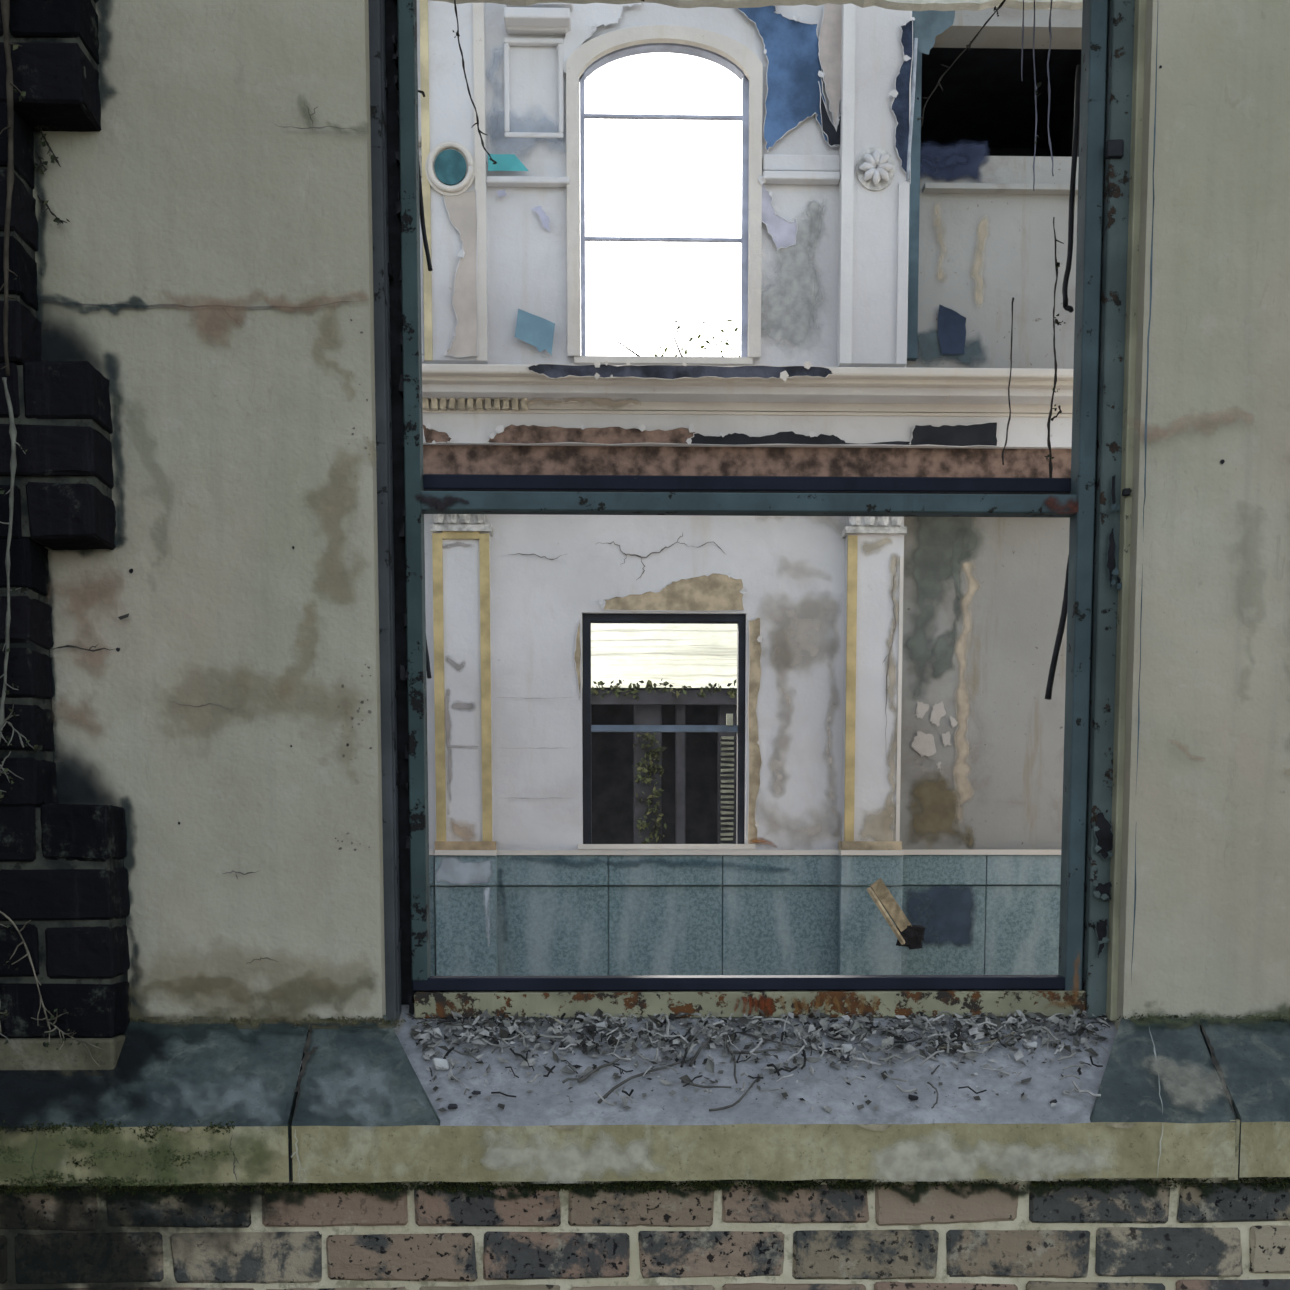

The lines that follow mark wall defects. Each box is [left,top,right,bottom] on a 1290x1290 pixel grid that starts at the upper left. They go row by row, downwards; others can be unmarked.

spalling [737,3,842,151]
crack [42,299,367,328]
peeling [443,190,478,358]
damp [761,201,824,344]
spalling [486,422,998,447]
crack [599,534,724,579]
spalling [599,572,763,844]
peeling [911,701,958,772]
damp [122,798,402,1032]
rust [734,995,878,1016]
crack [291,1025,319,1184]